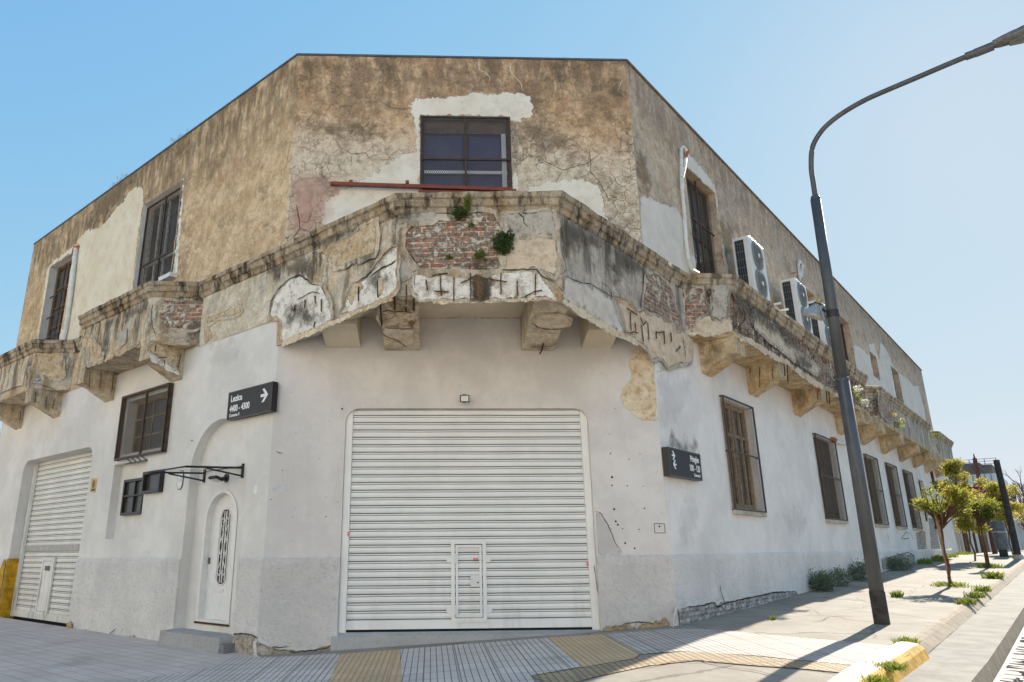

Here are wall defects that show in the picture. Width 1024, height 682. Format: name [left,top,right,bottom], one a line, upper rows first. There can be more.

crack [539,139,618,202]
damp [561,220,646,284]
flaking render [81,297,243,392]
flaking render [268,207,830,423]
damp [736,297,812,372]
flaking render [864,393,896,423]